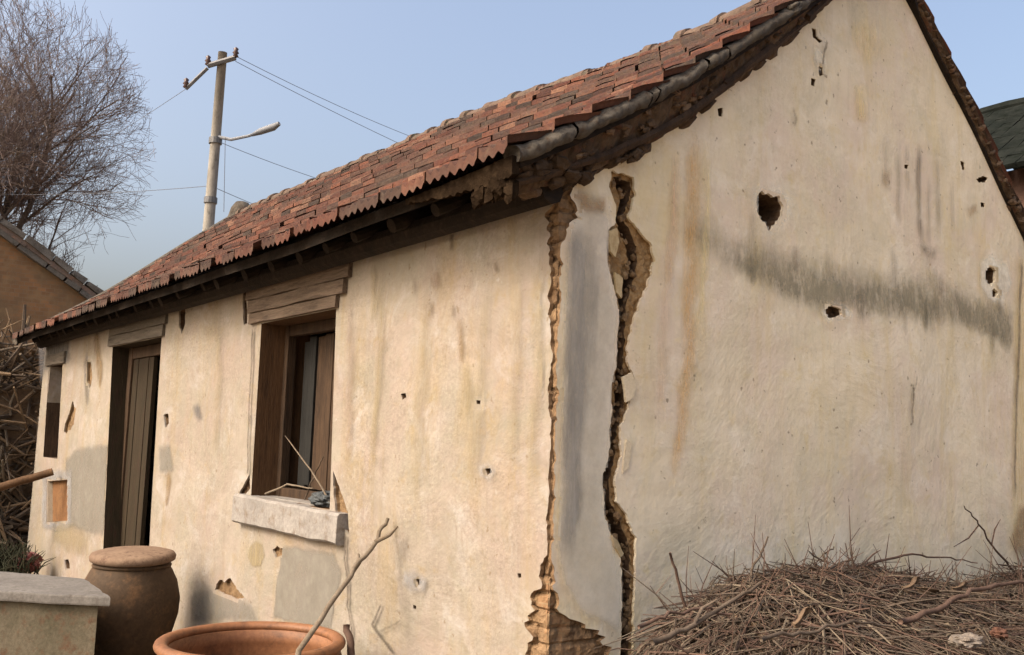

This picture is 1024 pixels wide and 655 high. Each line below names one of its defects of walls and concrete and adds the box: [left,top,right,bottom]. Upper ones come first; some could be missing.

peeling [981,258,1010,301]
spalling [824,305,849,319]
damp [737,256,1011,344]
spalling [64,402,76,434]
crack [601,170,655,655]
peeling [248,542,282,566]
spalling [215,578,245,599]